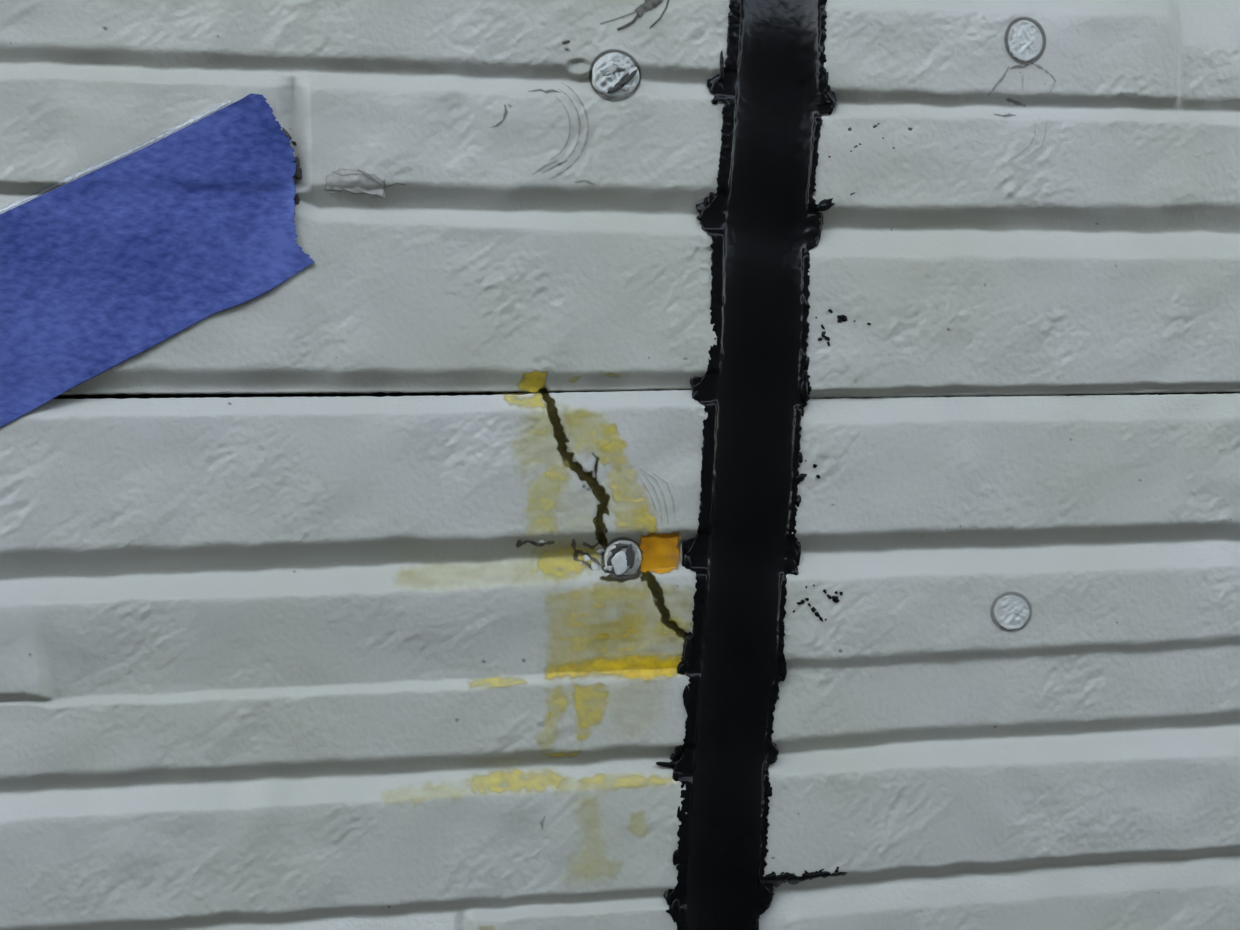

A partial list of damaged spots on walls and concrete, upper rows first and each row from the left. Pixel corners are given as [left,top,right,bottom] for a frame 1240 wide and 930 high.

crack [539,388,687,640]